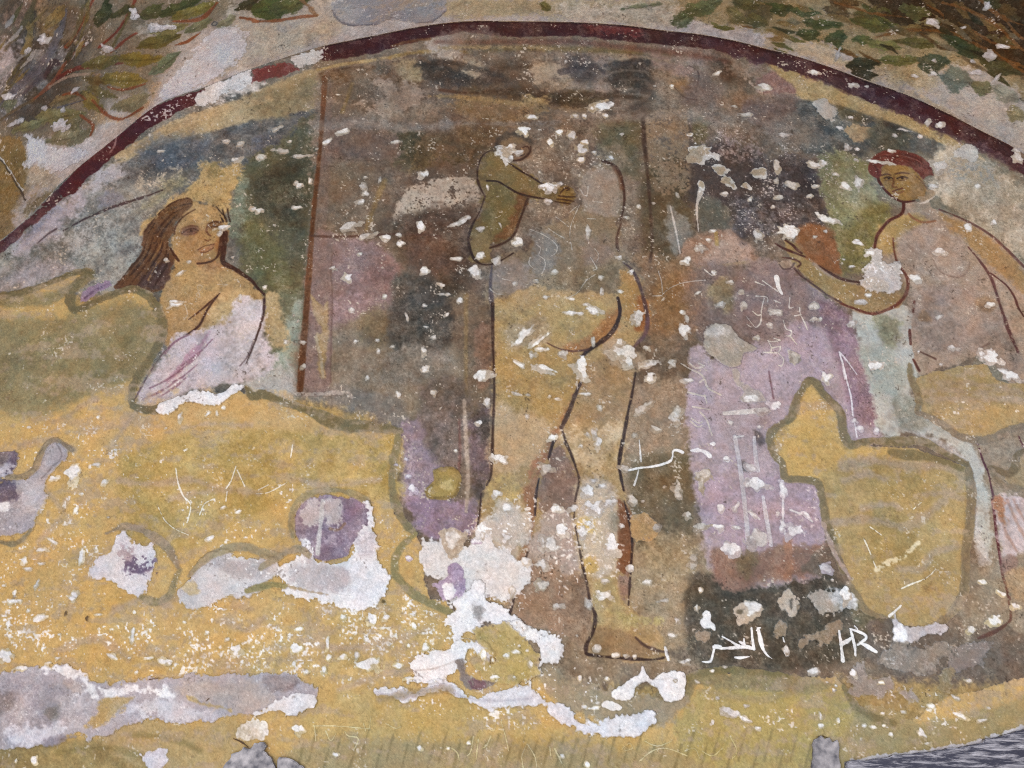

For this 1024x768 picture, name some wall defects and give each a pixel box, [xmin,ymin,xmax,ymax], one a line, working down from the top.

flaking render [159,24,253,107]
peeling [491,114,539,166]
peeling [546,99,615,164]
peeling [685,132,820,209]
peeling [844,118,946,166]
peeling [752,211,843,242]
flaking render [841,239,922,305]
peeling [510,324,694,411]
flaking render [155,383,245,430]
flaking render [244,478,701,739]
flaking render [807,578,1024,761]
flaking render [139,747,169,768]